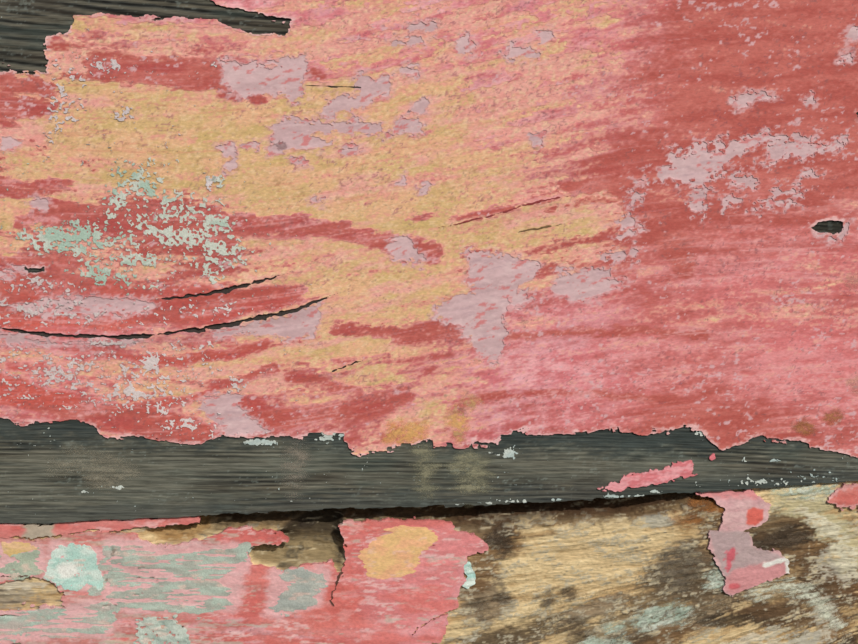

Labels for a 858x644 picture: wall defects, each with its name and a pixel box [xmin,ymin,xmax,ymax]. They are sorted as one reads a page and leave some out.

peeling [845,26,858,41]
peeling [90,58,120,73]
peeling [811,220,849,242]
crack [161,275,279,300]
crack [0,293,338,340]
peeling [176,418,200,431]